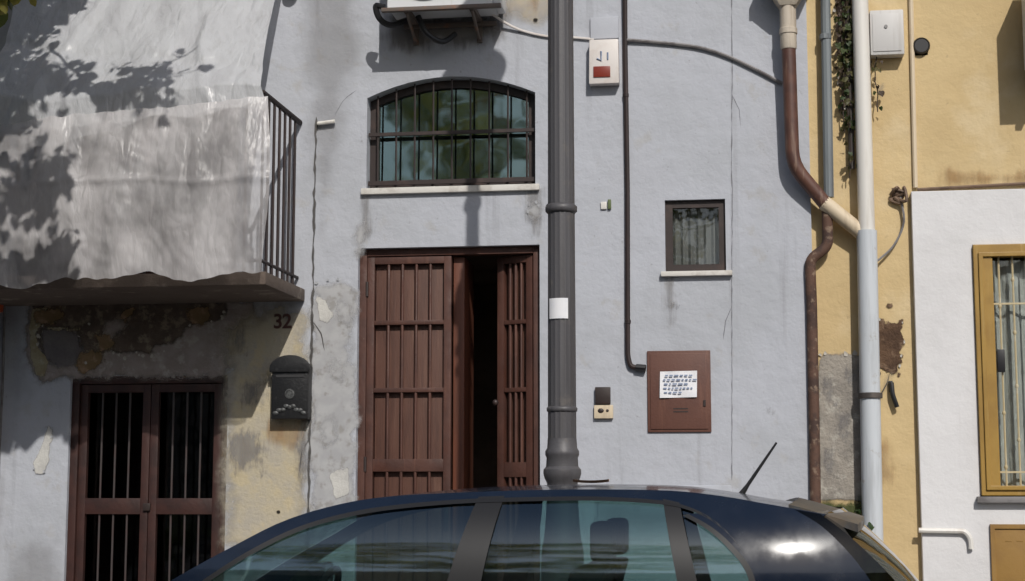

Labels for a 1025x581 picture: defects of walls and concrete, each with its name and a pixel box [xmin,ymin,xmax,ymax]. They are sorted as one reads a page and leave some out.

leakage [507,0,548,20]
spalling [24,302,257,383]
spalling [879,318,905,377]
peeling [303,278,359,510]